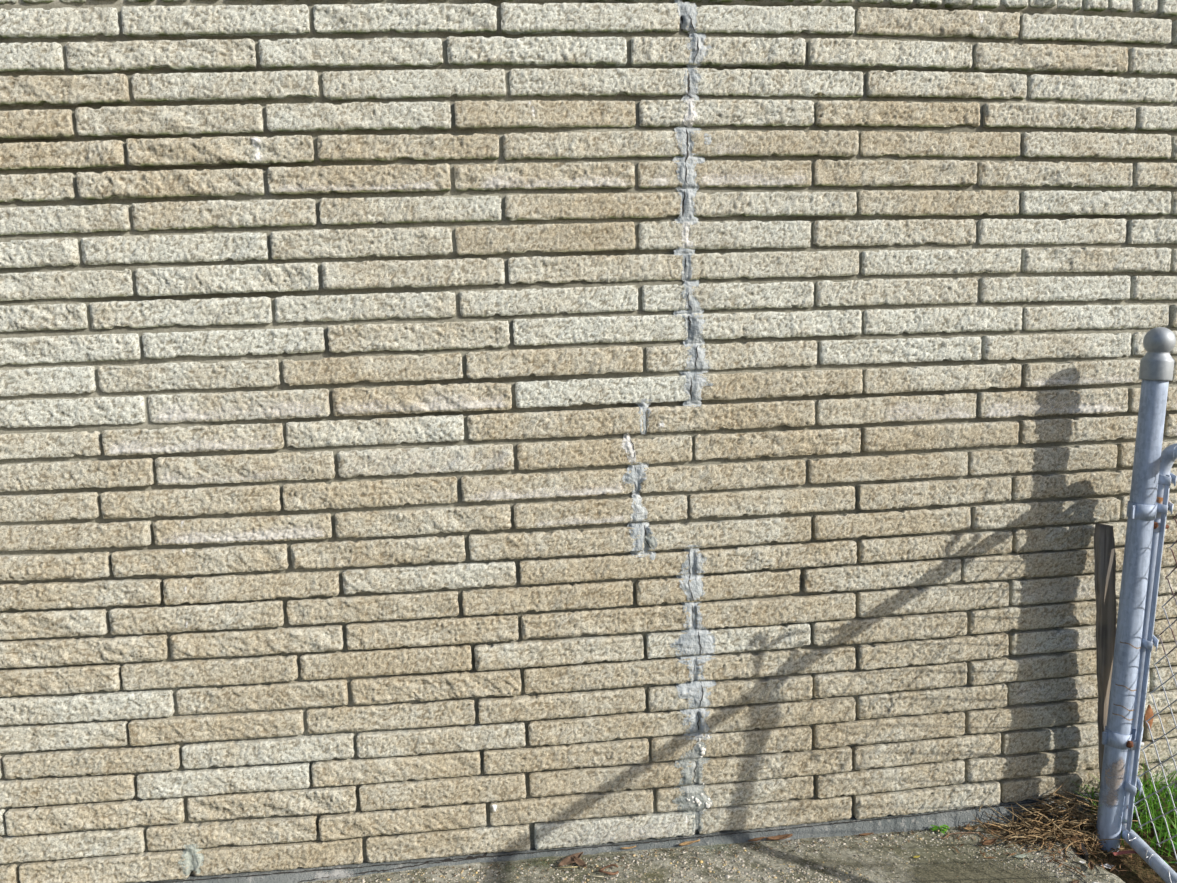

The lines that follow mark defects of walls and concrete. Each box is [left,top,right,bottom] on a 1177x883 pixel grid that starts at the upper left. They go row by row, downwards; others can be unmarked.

crack [672,0,713,407]
crack [621,398,716,834]